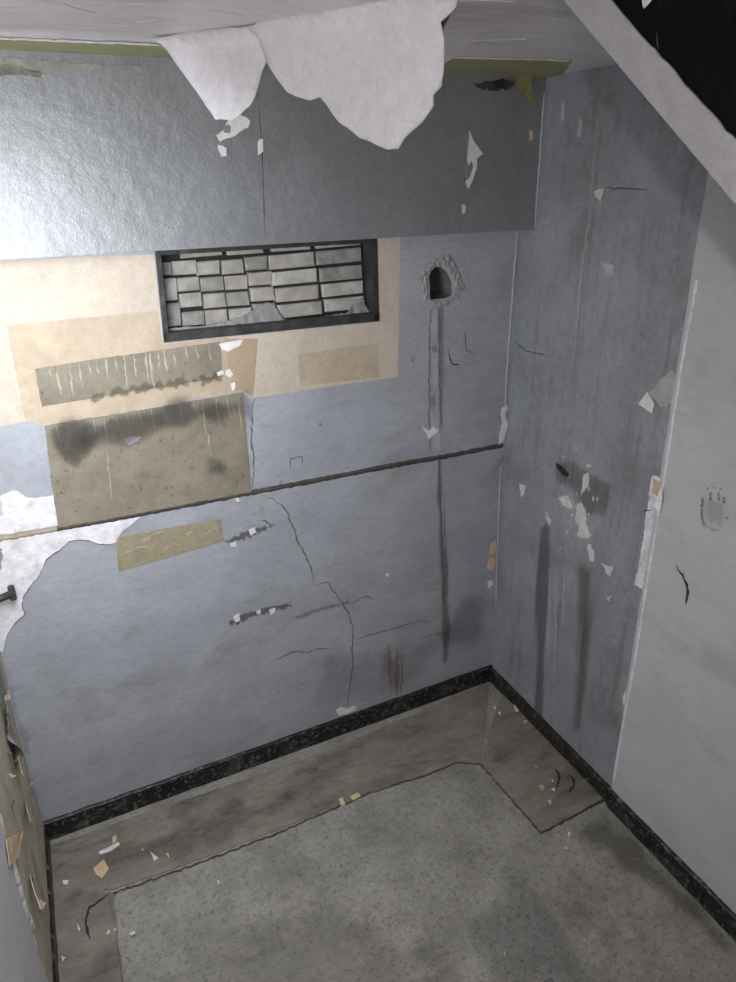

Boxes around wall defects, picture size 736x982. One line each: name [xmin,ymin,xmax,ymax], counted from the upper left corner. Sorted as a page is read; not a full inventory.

peeling [0,0,572,156]
peeling [466,131,483,189]
peeling [0,237,400,427]
flaking render [417,254,466,307]
spalling [227,520,274,547]
crack [0,398,503,705]
damp [421,307,445,622]
peeling [490,404,509,481]
peeling [546,455,613,576]
spalling [229,604,291,625]
peeling [0,490,140,982]
peeling [336,706,357,715]